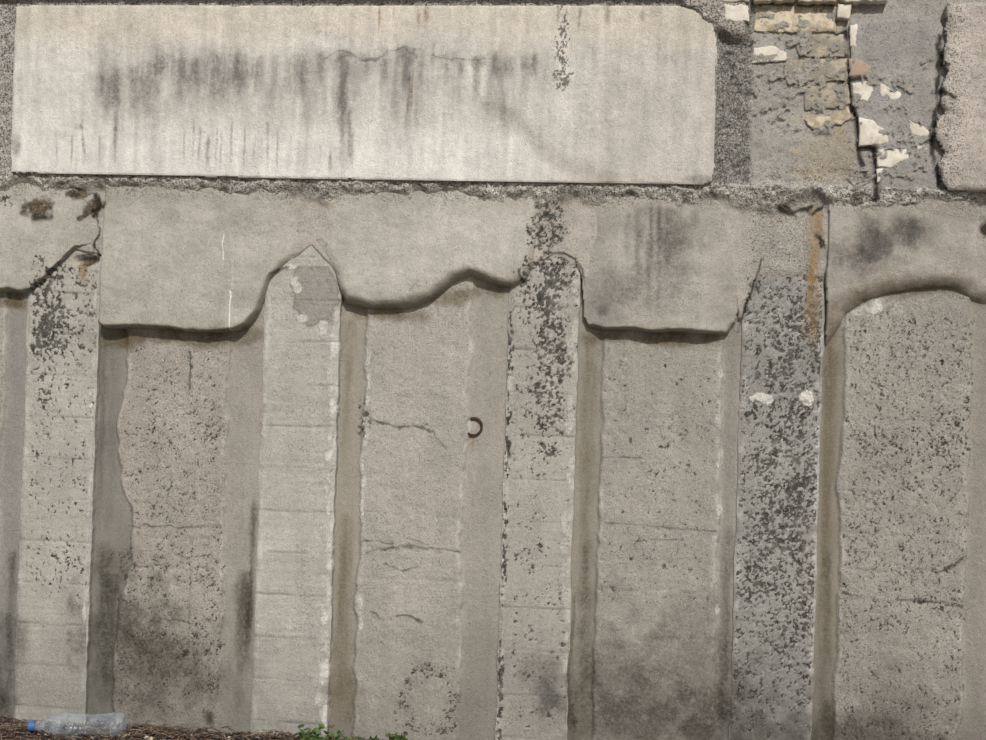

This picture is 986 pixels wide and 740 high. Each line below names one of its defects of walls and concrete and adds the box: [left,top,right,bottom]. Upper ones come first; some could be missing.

damp [339,55,347,109]
crack [812,25,879,200]